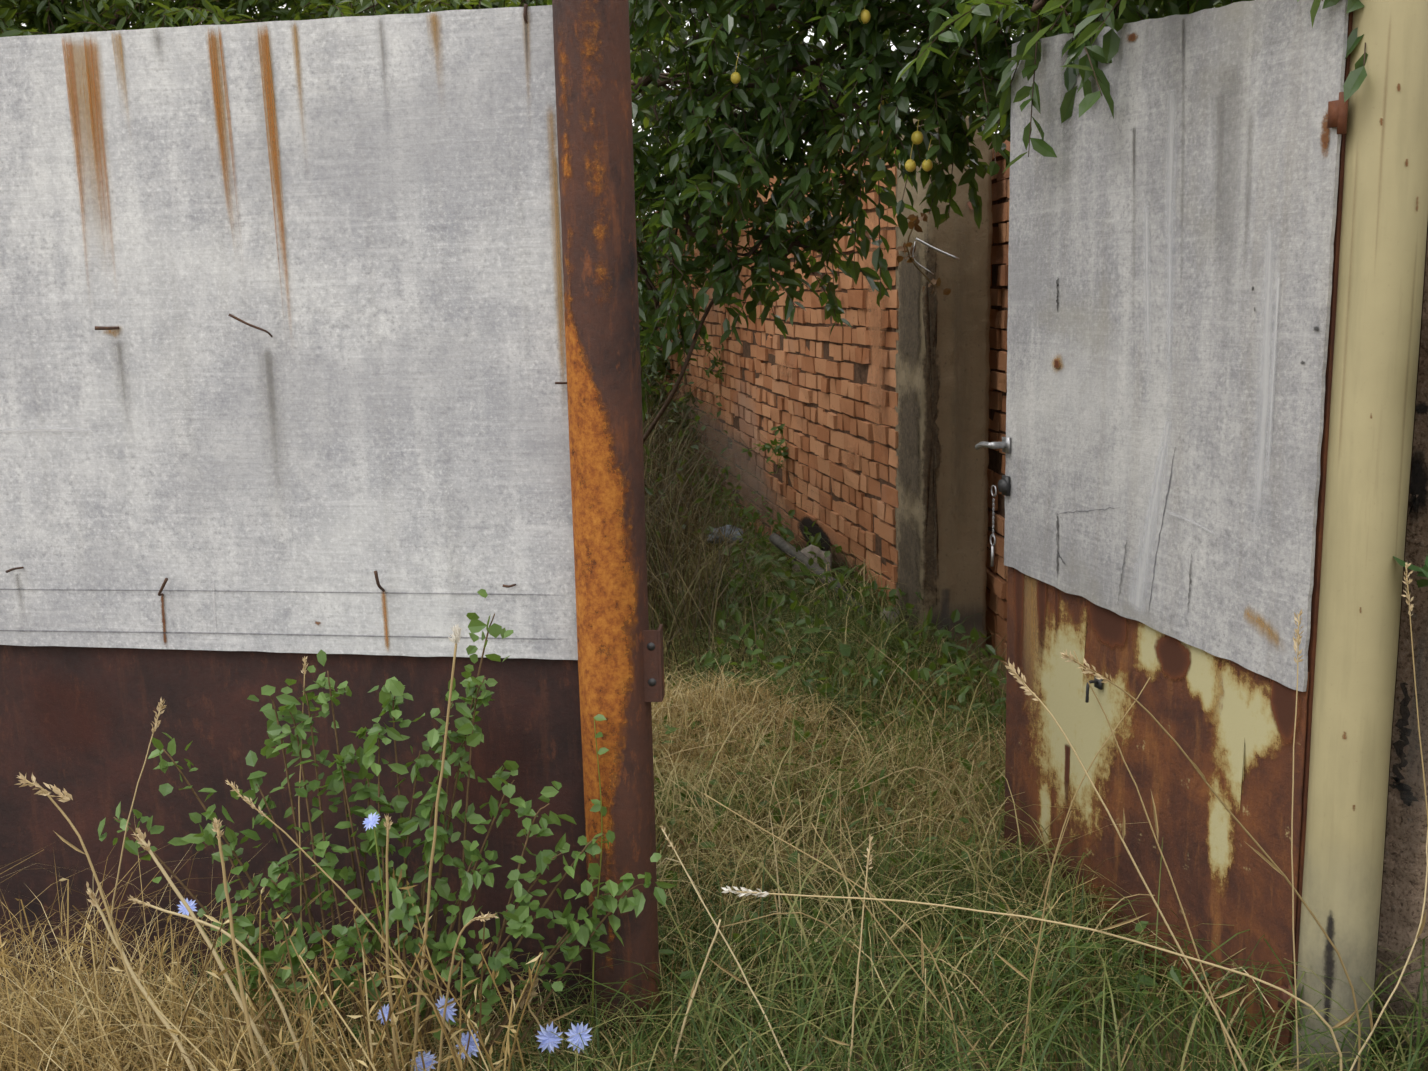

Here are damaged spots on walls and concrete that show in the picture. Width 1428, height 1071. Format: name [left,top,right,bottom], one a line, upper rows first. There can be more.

corrosion [62,40,107,184]
corrosion [112,36,124,70]
corrosion [209,33,233,176]
corrosion [258,30,284,244]
corrosion [550,115,637,867]